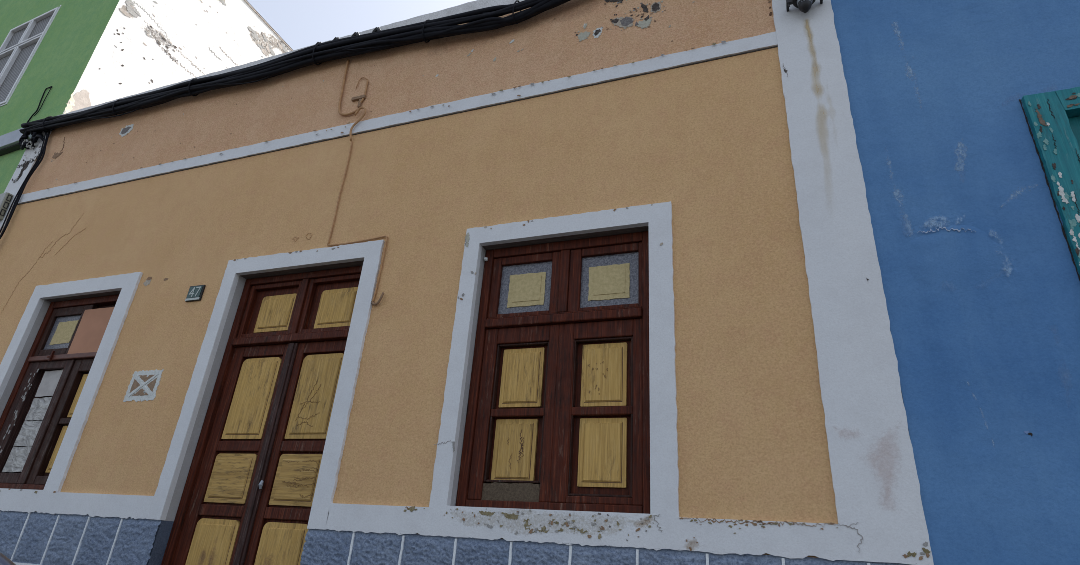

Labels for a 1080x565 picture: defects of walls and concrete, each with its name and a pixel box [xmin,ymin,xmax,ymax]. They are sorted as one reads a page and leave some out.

peeling [119,0,141,18]
peeling [248,26,288,56]
peeling [576,0,665,42]
peeling [64,89,91,114]
peeling [1028,100,1080,265]
crack [1,213,86,313]
peeling [446,482,652,541]
peeling [902,542,930,560]